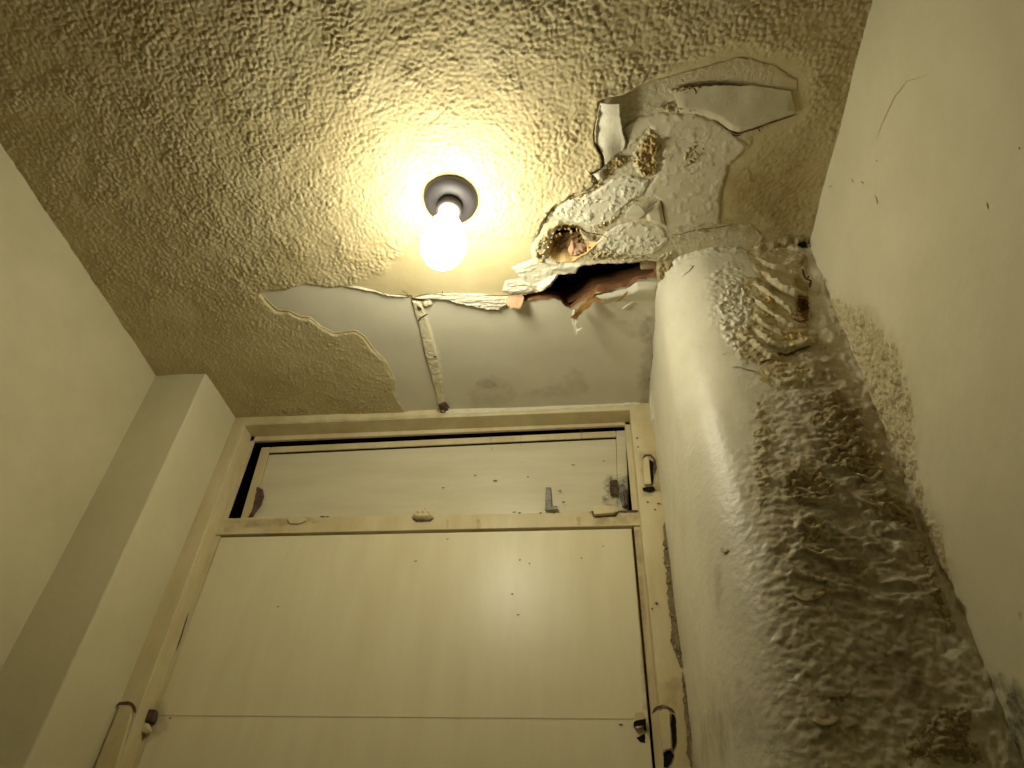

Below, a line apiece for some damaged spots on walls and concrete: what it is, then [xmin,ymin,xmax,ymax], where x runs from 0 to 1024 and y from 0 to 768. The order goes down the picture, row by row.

peeling [262,58,819,420]